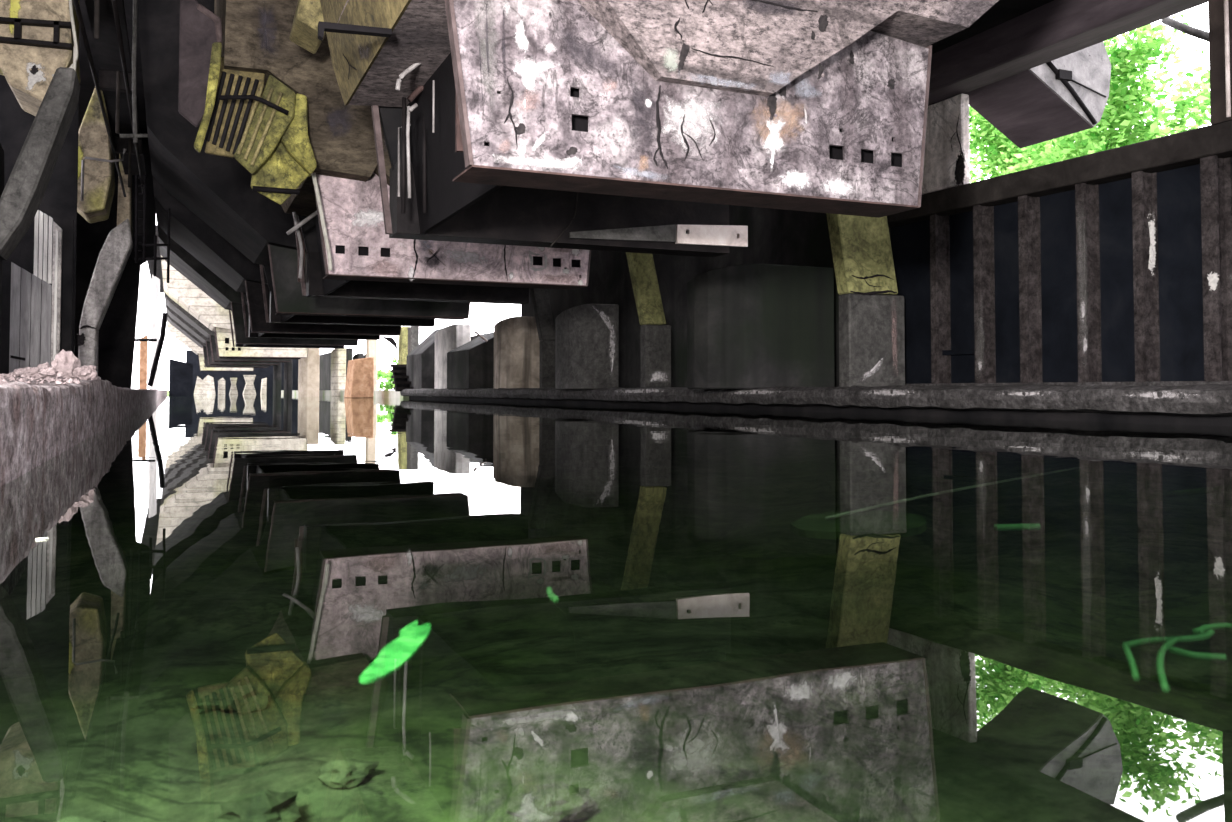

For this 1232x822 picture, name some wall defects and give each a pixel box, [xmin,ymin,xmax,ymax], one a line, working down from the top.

crack [674,0,774,67]
crack [750,0,818,12]
crack [653,85,716,169]
crack [850,274,897,296]